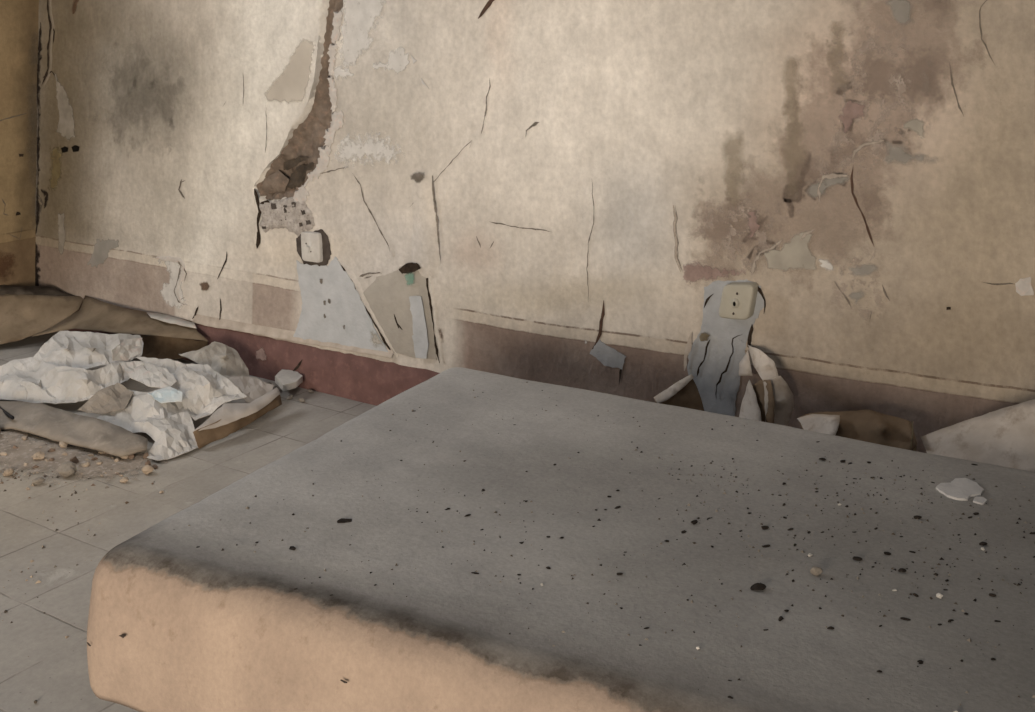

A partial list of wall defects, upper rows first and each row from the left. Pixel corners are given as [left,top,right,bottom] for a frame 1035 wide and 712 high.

crack [478,0,494,19]
crack [979,0,994,63]
spalling [250,0,437,360]
crack [850,169,874,246]
flaking render [585,340,626,369]
flaking render [683,228,833,416]